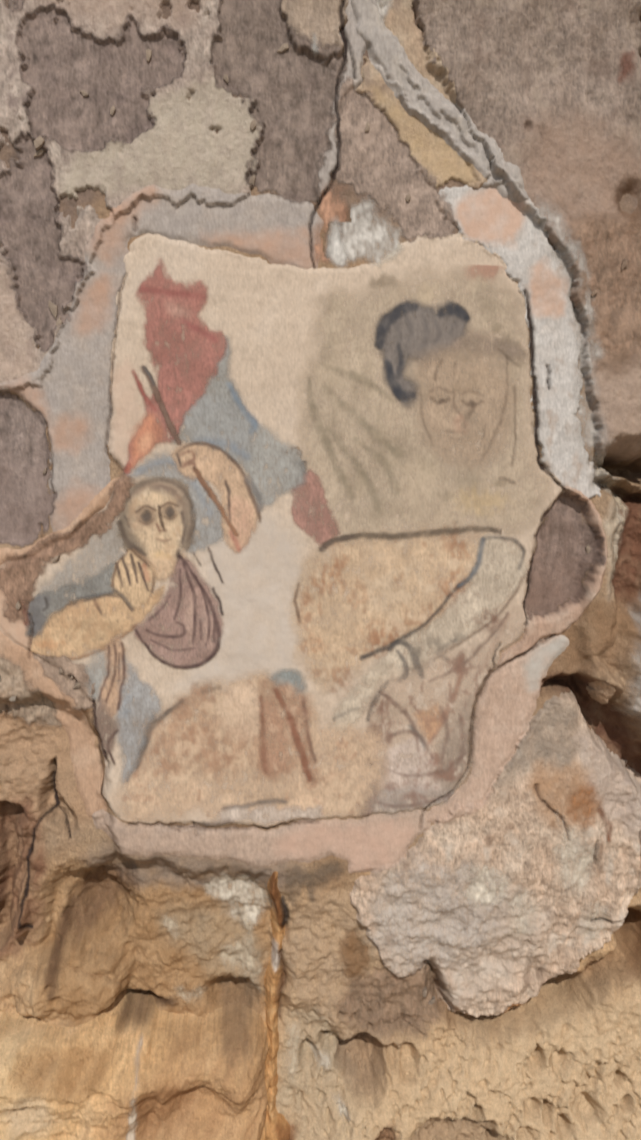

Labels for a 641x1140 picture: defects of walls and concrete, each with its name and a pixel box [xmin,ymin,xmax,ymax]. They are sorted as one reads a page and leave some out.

spalling [0,0,187,351]
crack [309,0,355,265]
spalling [210,0,458,242]
spalling [0,392,57,547]
crack [524,291,565,489]
spalling [525,491,606,620]
crack [468,557,552,764]
crack [18,758,71,929]